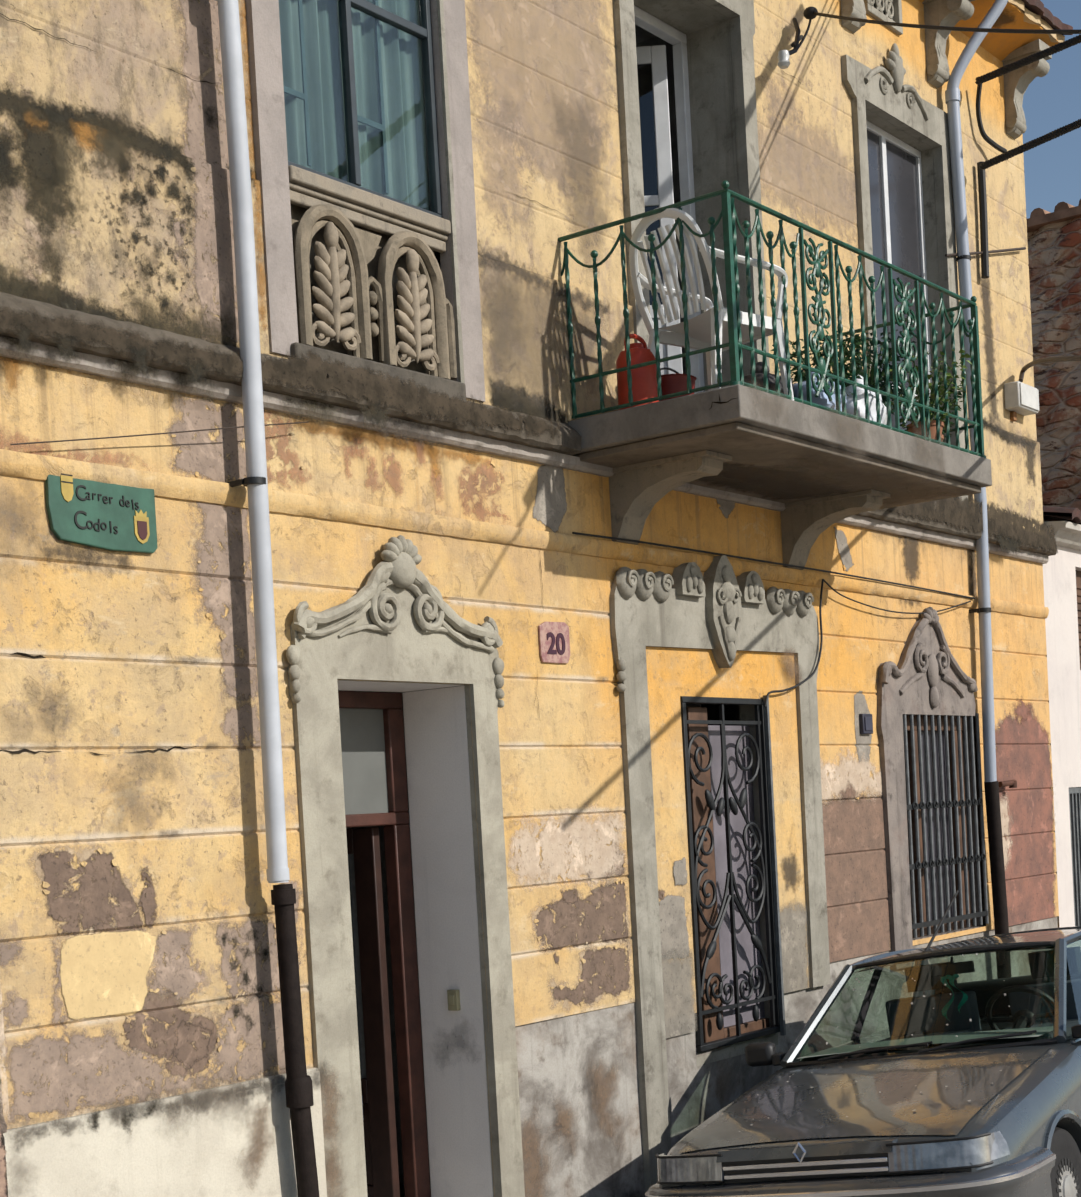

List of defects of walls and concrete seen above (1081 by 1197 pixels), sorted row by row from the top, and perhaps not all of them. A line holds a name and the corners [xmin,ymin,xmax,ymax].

water stain [0,84,236,347]
peeling [264,412,306,487]
water stain [983,419,1036,484]
crack [9,651,45,659]
crack [0,747,60,755]
crack [90,745,199,755]
spalling [820,691,891,963]
spalling [995,699,1056,926]
peeling [509,811,631,1010]
peeling [0,846,286,1197]
water stain [92,1075,286,1128]
water stain [522,1120,548,1197]